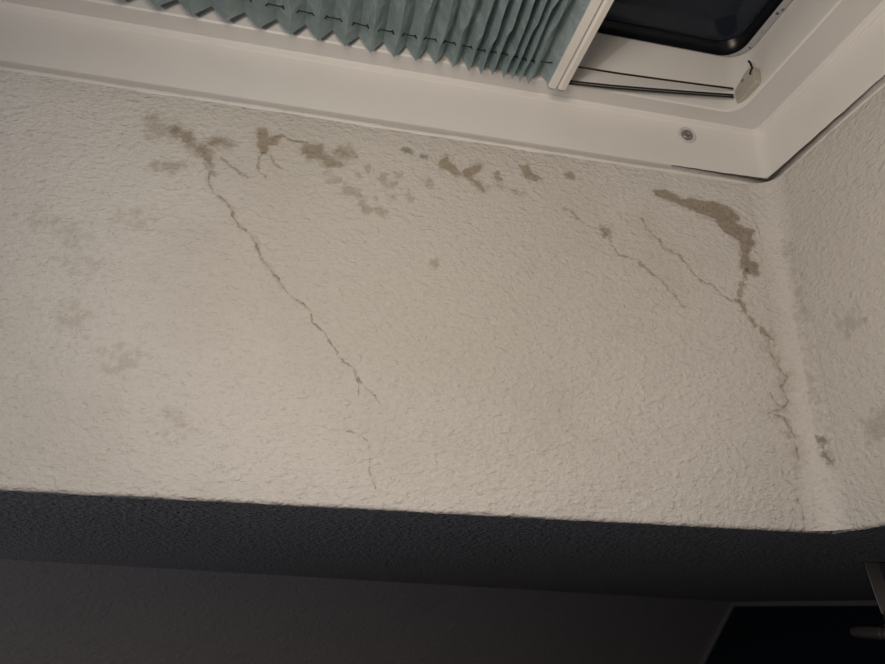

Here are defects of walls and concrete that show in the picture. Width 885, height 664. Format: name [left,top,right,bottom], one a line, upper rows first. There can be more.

leakage [258,129,342,167]
leakage [440,158,483,190]
leakage [519,165,539,181]
leakage [654,190,769,337]